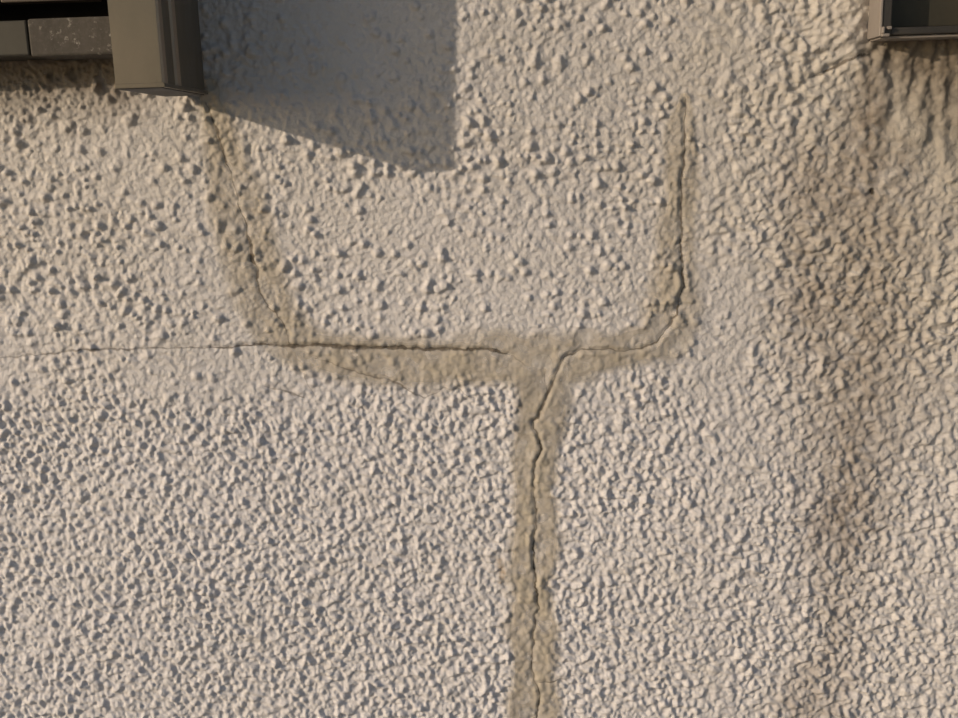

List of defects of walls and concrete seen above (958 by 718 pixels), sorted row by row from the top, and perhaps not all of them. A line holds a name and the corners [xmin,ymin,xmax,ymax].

crack [212,119,232,173]
crack [216,206,506,354]
crack [531,99,686,718]